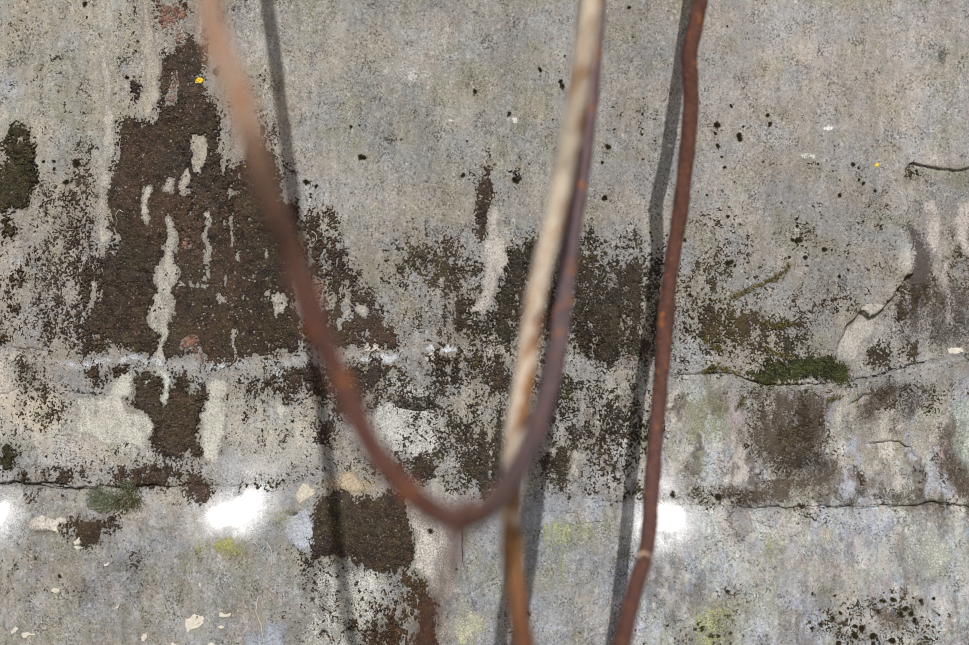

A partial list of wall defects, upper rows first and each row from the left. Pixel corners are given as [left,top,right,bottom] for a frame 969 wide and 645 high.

damp [138,0,162,127]
damp [141,134,209,223]
damp [57,206,211,450]
damp [270,293,287,318]
damp [338,305,369,329]
damp [472,206,509,320]
damp [832,315,881,363]
damp [892,199,969,357]
crack [0,480,87,488]
damp [360,353,449,464]
damp [679,376,969,510]
damp [409,510,450,591]